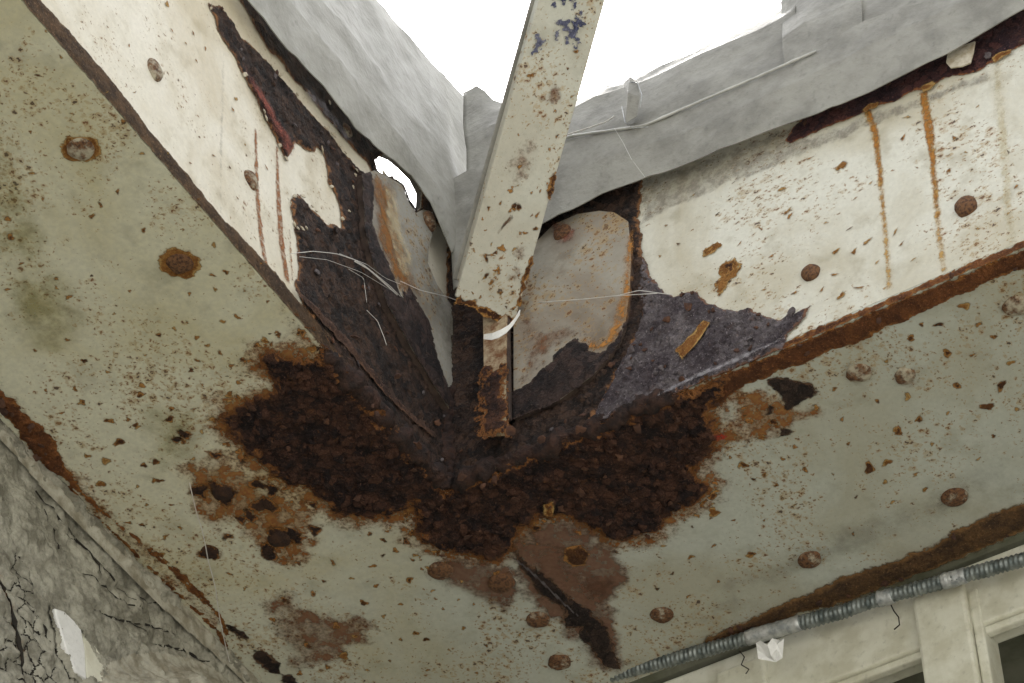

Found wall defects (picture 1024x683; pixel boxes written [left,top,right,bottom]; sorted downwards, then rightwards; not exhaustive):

corrosion [23,0,336,383]
peeling [208,0,445,464]
corrosion [865,110,897,289]
corrosion [920,92,951,258]
corrosion [178,236,1024,607]
peeling [538,258,819,444]
crack [0,553,71,683]
spalling [49,604,110,683]
crack [35,490,210,662]
corrosion [61,457,230,647]
corrosion [265,591,386,675]
corrosion [704,504,1024,643]